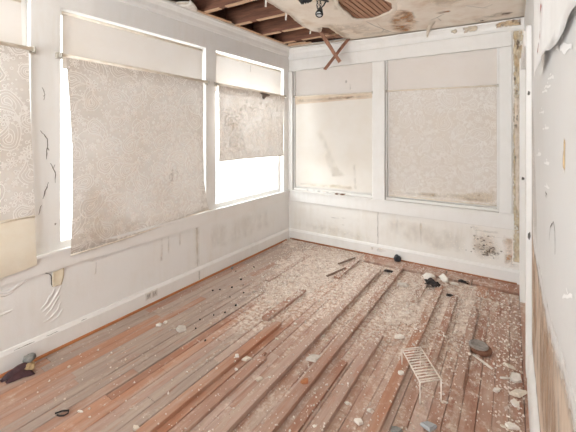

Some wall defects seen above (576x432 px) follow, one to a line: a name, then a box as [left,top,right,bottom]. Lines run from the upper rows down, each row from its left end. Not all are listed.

flaking render [168,0,348,47]
crack [38,131,56,215]
peeling [513,31,525,262]